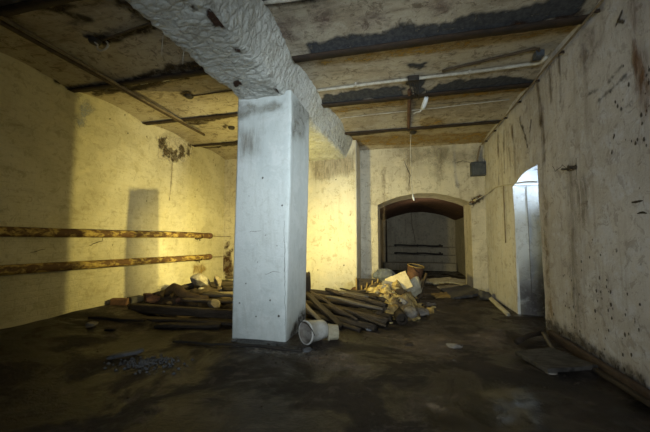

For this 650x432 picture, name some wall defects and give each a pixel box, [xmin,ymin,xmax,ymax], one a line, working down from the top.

leakage [307,0,586,61]
leakage [322,76,539,112]